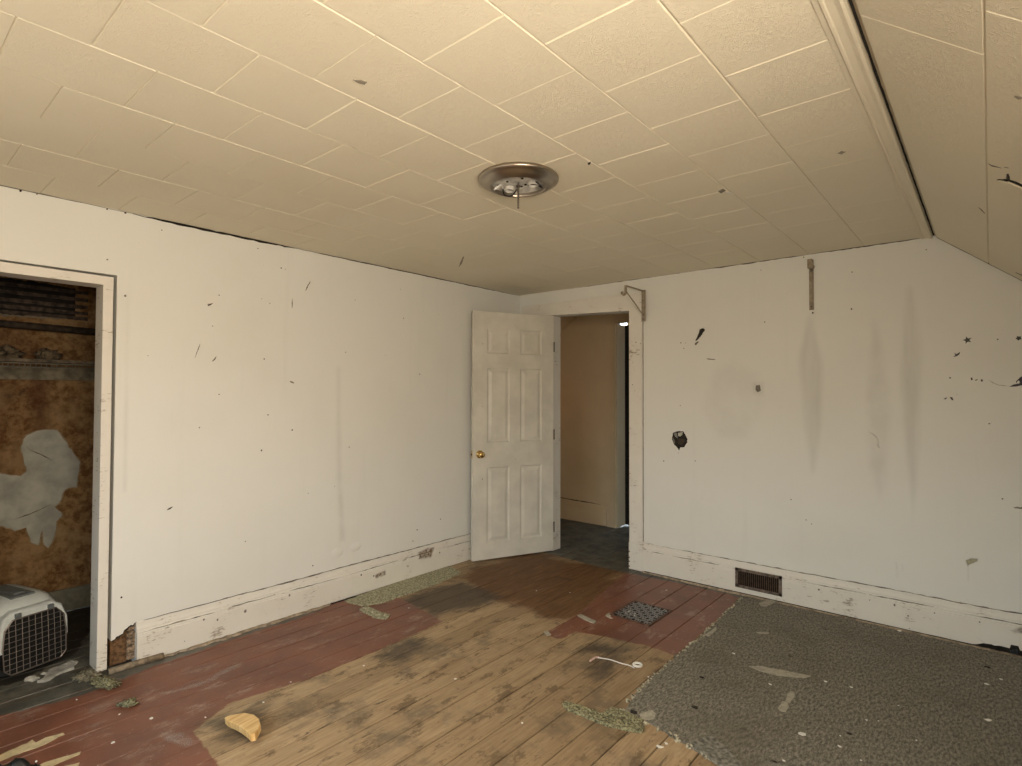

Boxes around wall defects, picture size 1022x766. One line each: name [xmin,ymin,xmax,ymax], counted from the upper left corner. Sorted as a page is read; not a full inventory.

crack [571,0,1022,289]
peeling [0,428,81,549]
flaking render [107,622,136,666]